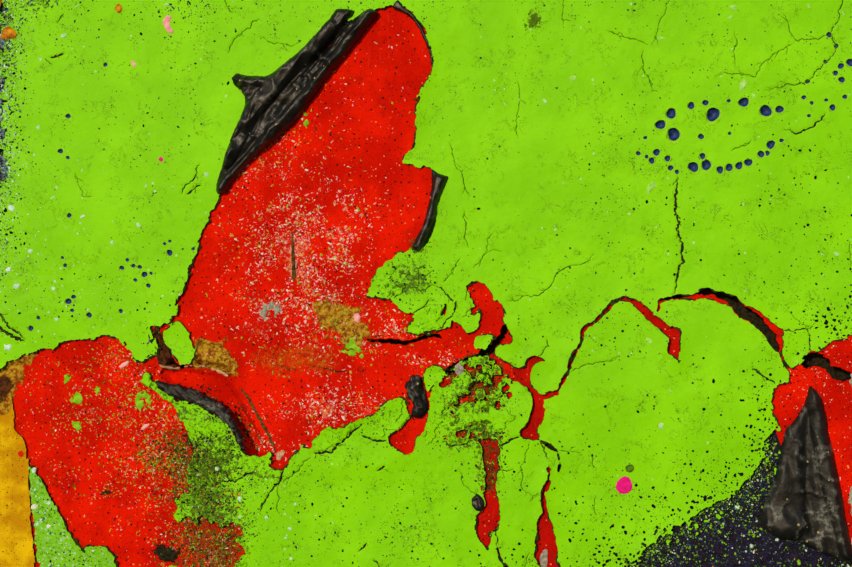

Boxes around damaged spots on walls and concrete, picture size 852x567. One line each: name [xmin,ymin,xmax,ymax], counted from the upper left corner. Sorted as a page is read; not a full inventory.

peeling [11,0,522,567]
crack [444,178,851,567]
peeling [759,335,852,567]